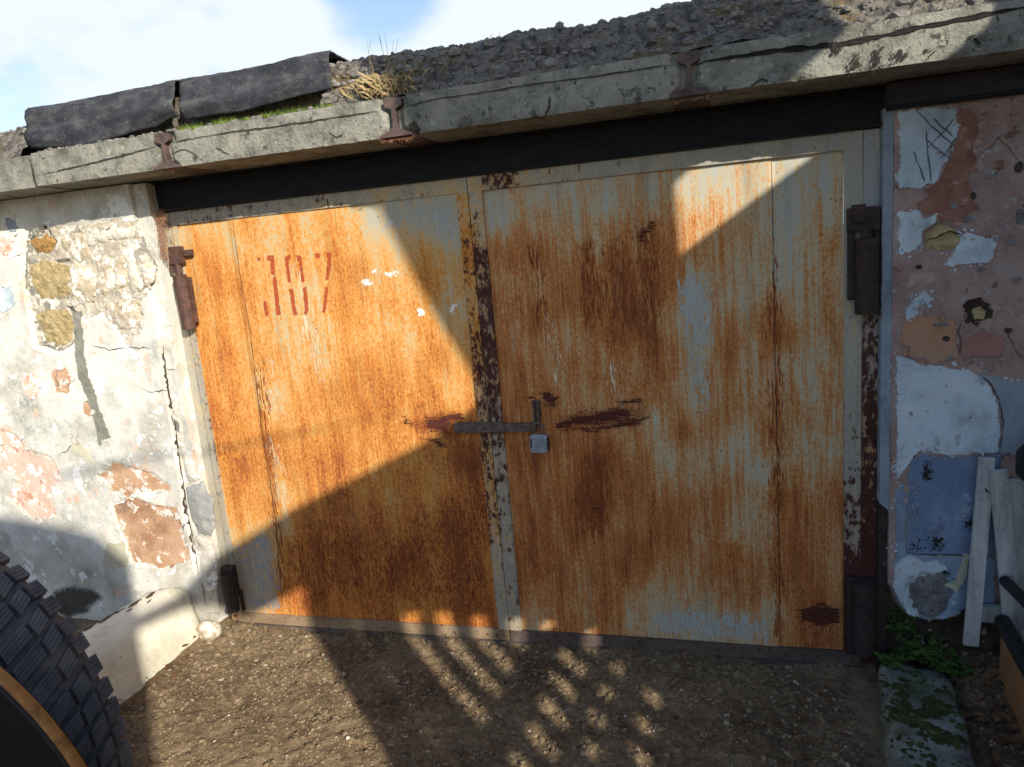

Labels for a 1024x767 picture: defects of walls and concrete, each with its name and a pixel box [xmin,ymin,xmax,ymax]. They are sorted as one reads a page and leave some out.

crack [405,7,1024,134]
peeling [887,104,1007,279]
flaking render [0,215,157,351]
rust [576,219,664,364]
peeling [0,424,63,527]
crack [60,301,198,569]
peeling [69,432,195,576]
rust [252,358,495,626]
rust [528,387,652,436]
rust [764,253,787,637]
peeling [873,289,1024,674]
rust [793,599,843,646]